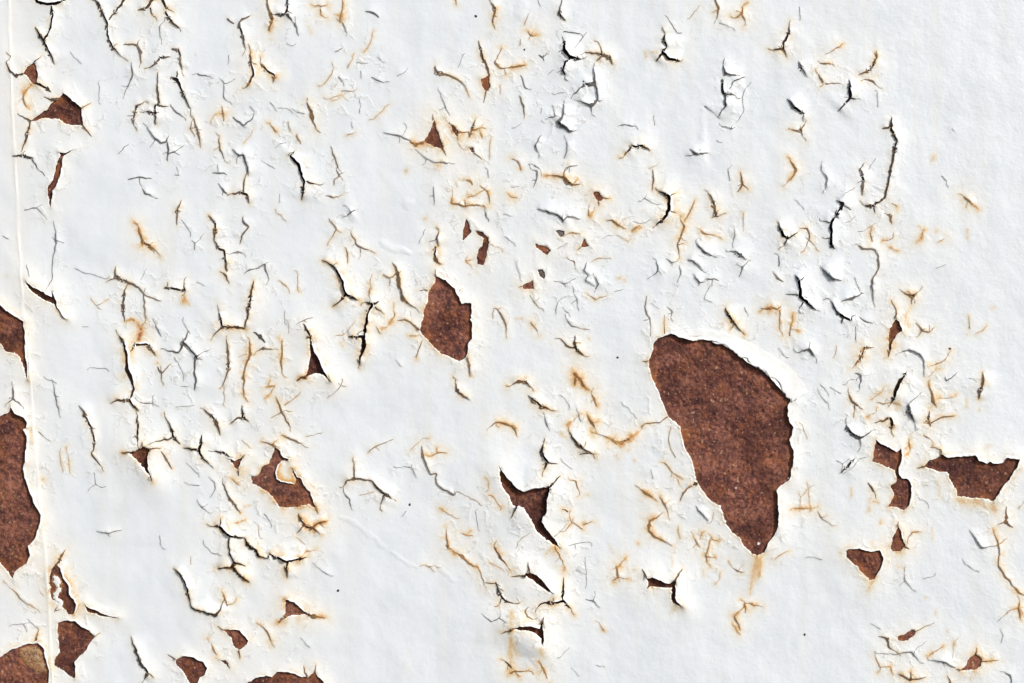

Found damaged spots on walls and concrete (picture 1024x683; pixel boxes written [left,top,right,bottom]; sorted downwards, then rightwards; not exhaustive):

crack [35,0,79,64]
crack [656,0,749,62]
crack [686,58,751,156]
crack [768,6,880,111]
peeling [0,405,44,578]
crack [75,0,613,583]
peeling [398,269,475,377]
crack [393,117,984,635]
peeling [643,329,808,555]
peeling [846,438,914,580]
peeling [918,447,1022,501]
peeling [0,549,120,683]